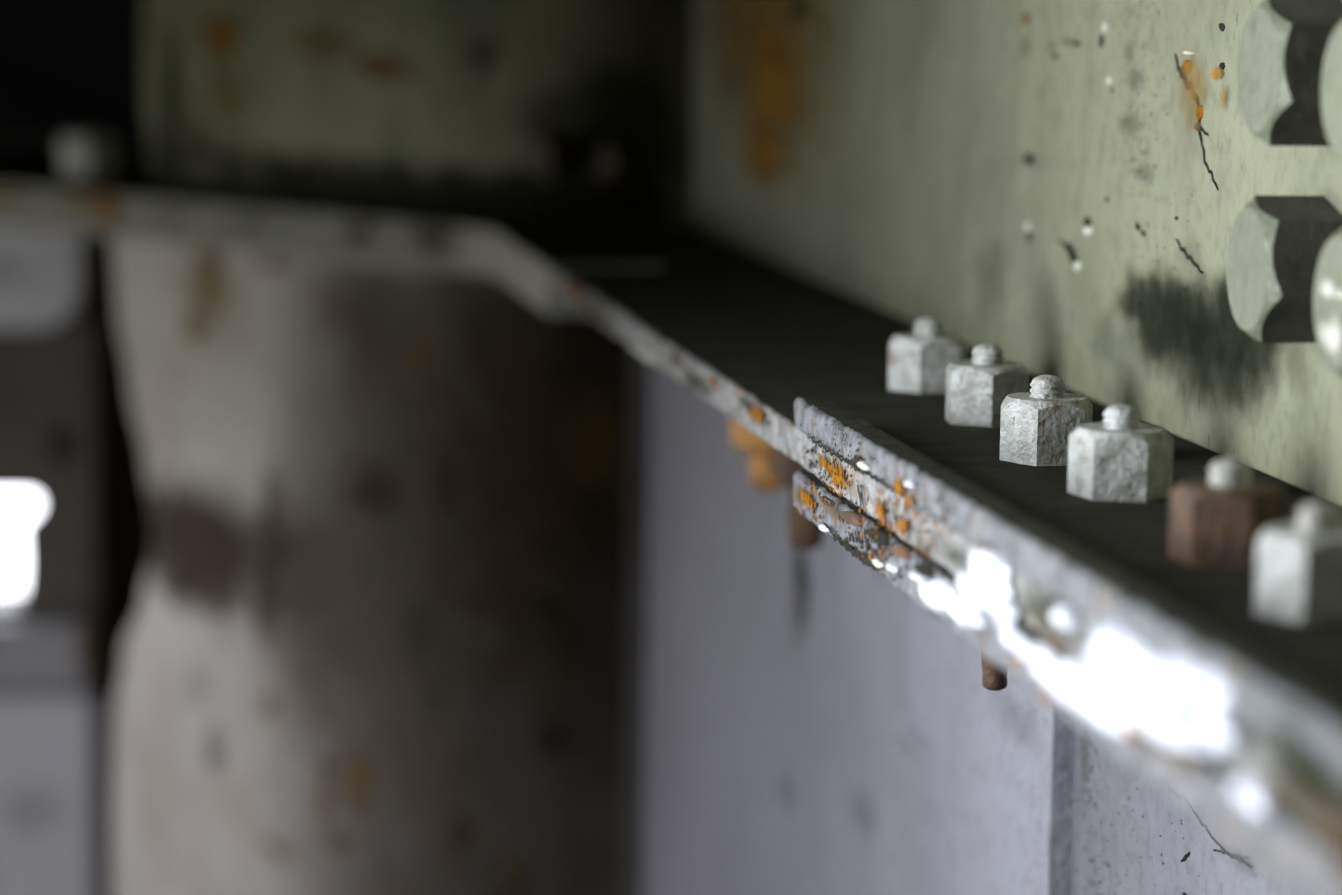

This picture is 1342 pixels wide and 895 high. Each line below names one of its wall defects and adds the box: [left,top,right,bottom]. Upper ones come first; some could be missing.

crack [1175,51,1218,190]
corrosion [794,423,978,582]
crack [1181,823,1252,869]